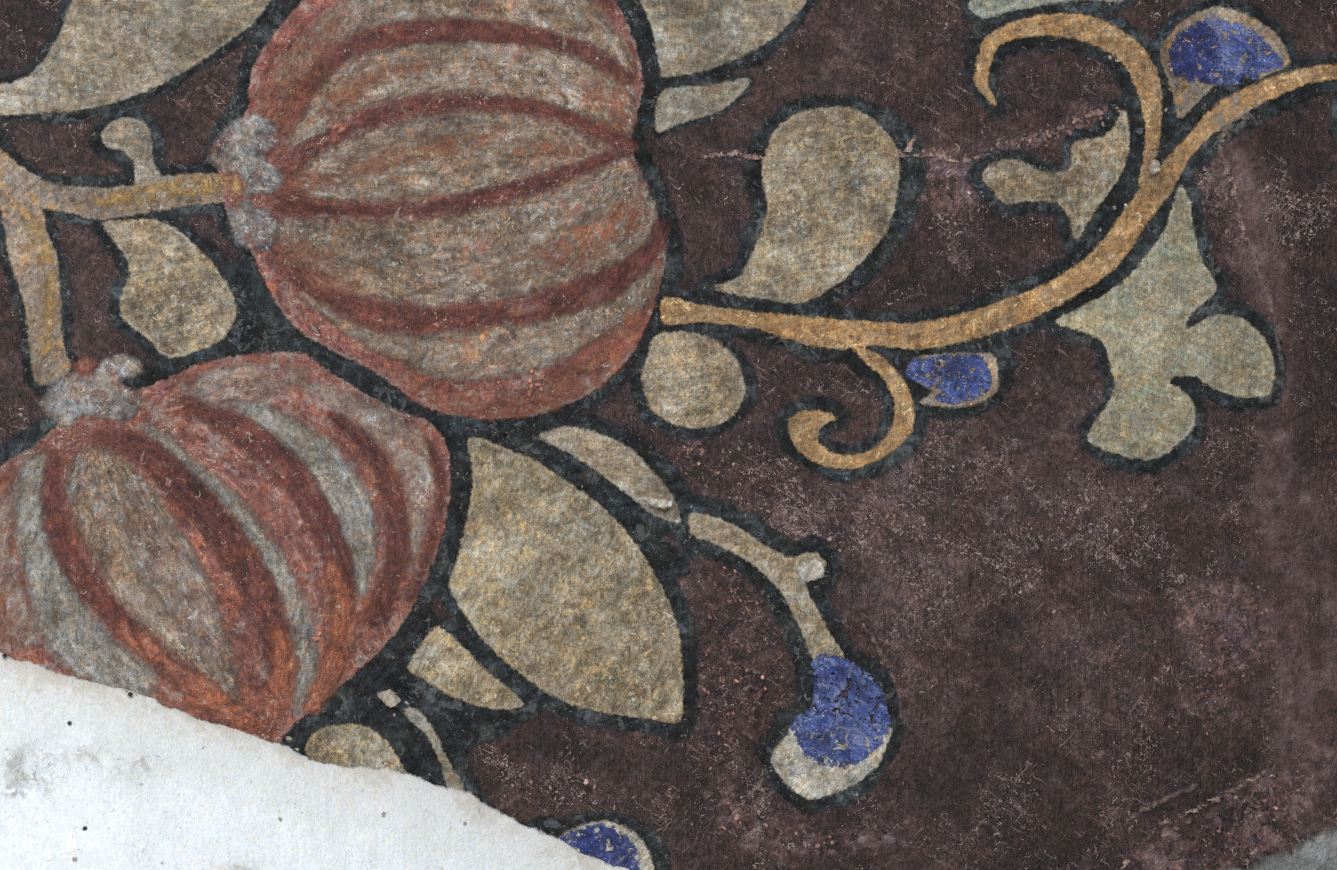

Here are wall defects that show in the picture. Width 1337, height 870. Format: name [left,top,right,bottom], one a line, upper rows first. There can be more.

peeling [377,689,408,716]
peeling [700,557,792,748]
peeling [704,786,909,864]
peeling [1128,748,1331,870]